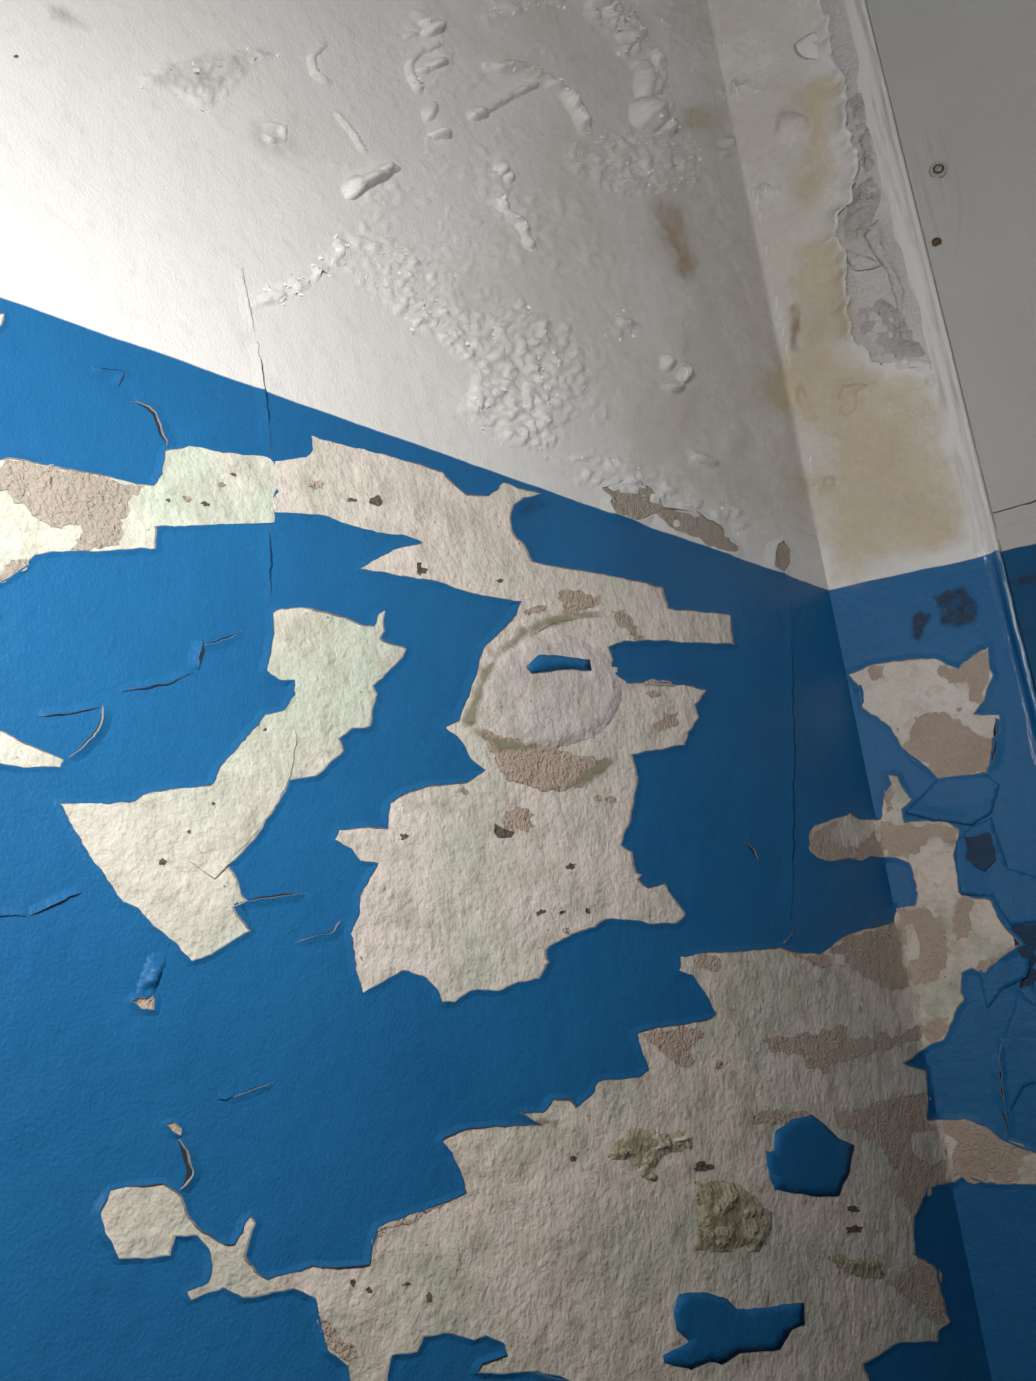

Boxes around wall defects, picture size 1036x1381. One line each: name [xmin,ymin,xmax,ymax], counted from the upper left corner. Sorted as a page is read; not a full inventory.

peeling [0,432,740,1016]
peeling [90,642,1036,1381]
flaking render [592,477,800,581]
damp [668,68,952,552]